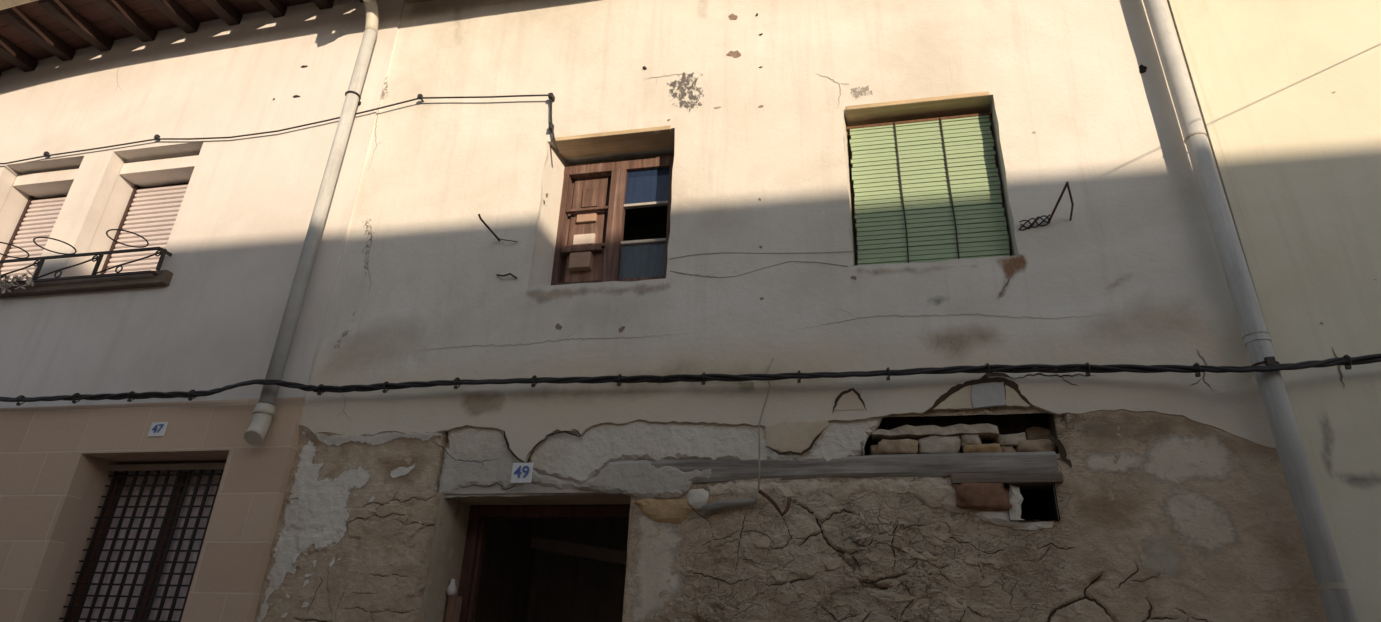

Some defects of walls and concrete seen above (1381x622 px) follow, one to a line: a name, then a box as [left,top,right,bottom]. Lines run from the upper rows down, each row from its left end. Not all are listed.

corrosion [1003,255,1026,277]
flaking render [254,388,1328,622]
crack [689,503,1076,622]
crack [1047,559,1208,622]